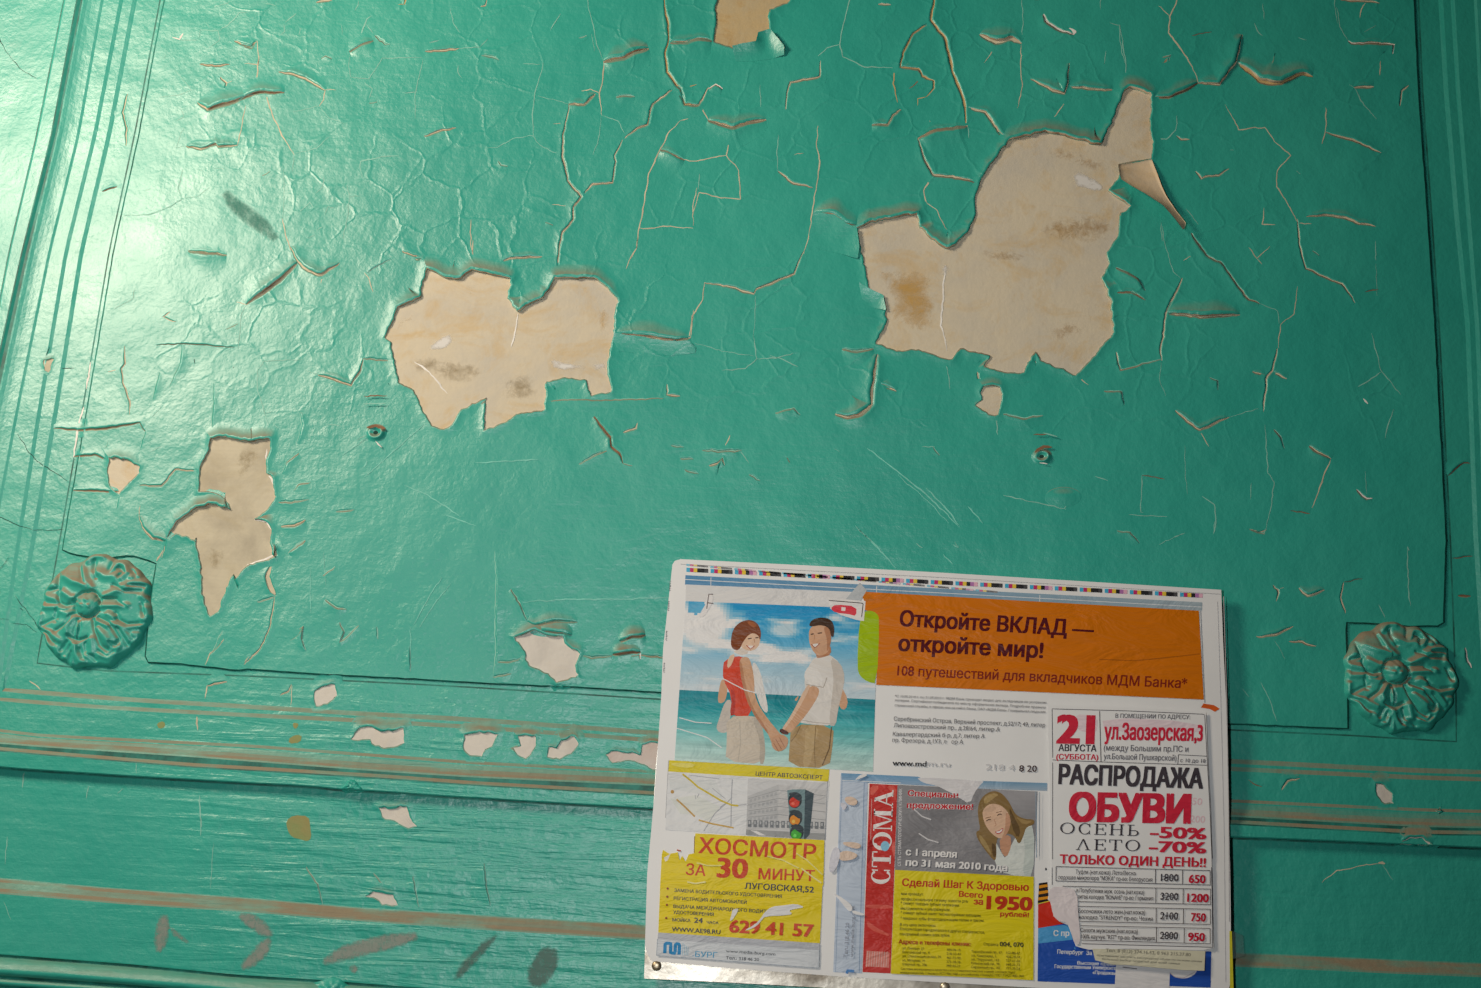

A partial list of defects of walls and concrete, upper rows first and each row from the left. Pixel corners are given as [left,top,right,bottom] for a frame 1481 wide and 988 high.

peeling [703,0,800,62]
peeling [375,252,696,441]
crack [54,0,1127,561]
peeling [809,69,1186,423]
crack [1081,0,1411,546]
peeling [100,443,148,500]
peeling [161,421,285,624]
crack [196,349,411,730]
peeling [345,714,412,755]
peeling [505,619,588,691]
crack [1244,547,1411,721]
crack [1454,648,1472,669]